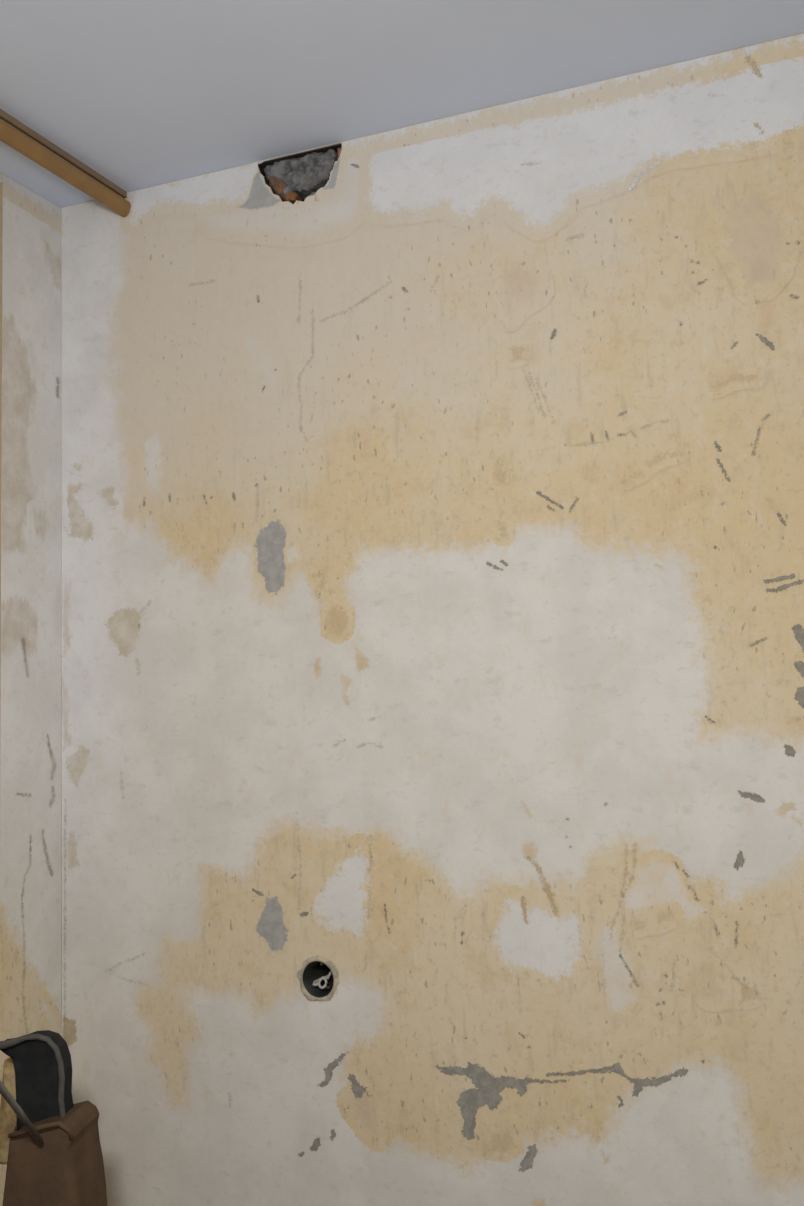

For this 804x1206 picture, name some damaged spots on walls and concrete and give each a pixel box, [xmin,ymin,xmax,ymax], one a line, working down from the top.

spalling [235,144,359,211]
peeling [0,197,61,1030]
peeling [61,200,804,1206]
leakage [337,1076,390,1152]
leakage [481,1123,524,1163]